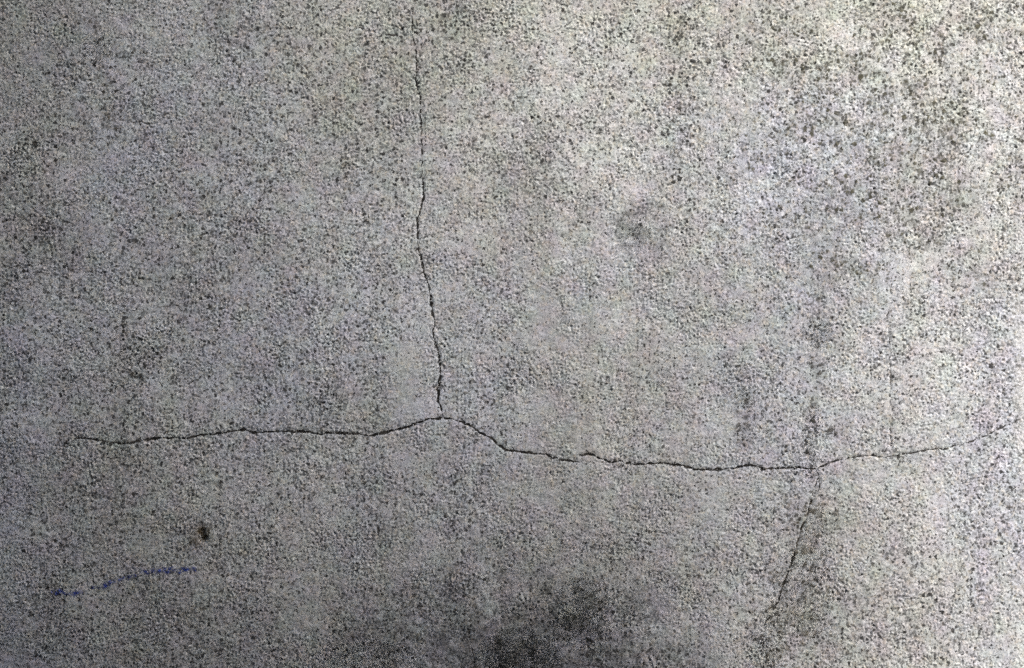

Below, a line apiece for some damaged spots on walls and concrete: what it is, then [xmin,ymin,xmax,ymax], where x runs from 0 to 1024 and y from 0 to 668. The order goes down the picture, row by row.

crack [66,11,956,625]